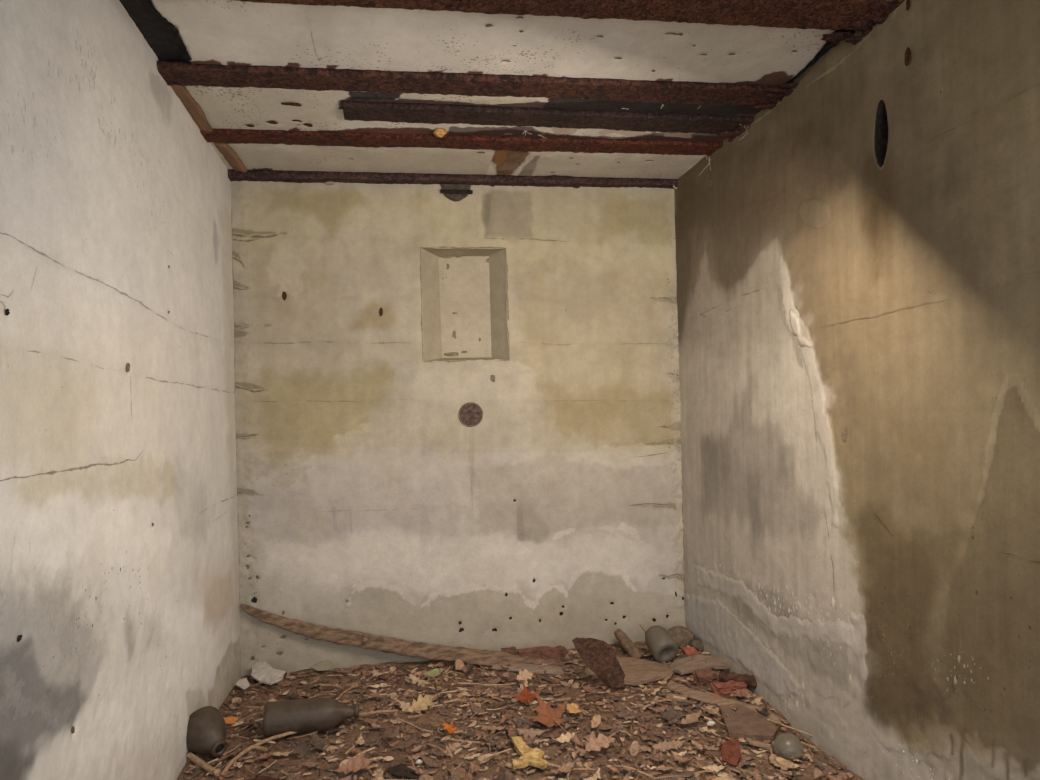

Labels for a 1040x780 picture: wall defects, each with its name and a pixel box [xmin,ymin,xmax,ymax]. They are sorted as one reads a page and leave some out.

corrosion [190,57,254,66]
corrosion [333,96,545,111]
corrosion [709,69,797,85]
crack [0,204,406,617]
water stain [183,100,1040,780]
water stain [0,429,218,567]
water stain [0,552,99,780]
water stain [120,593,168,676]
water stain [160,744,190,780]